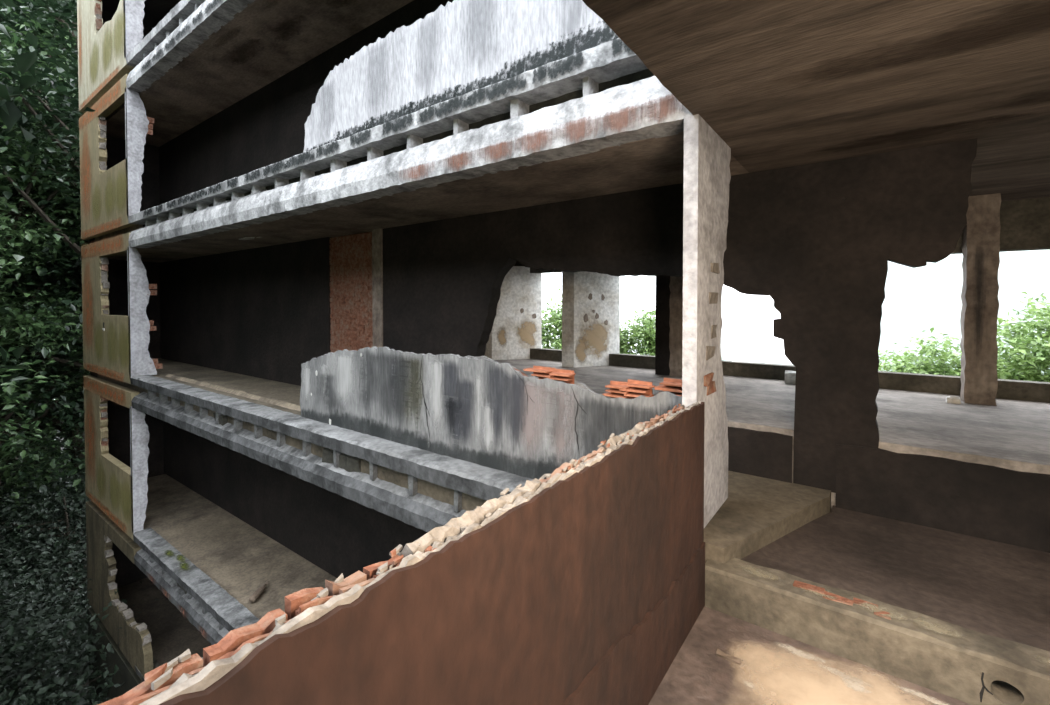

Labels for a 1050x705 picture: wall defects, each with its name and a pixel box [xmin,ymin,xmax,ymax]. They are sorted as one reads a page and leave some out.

leakage [143,20,633,217]
rust [522,94,677,150]
rust [403,164,428,179]
rust [448,152,470,170]
rust [485,141,510,160]
spalling [603,377,695,423]
leakage [302,354,657,480]
peeling [598,422,645,448]
peeling [376,544,403,575]
spalling [104,535,152,646]
peeling [311,573,344,601]